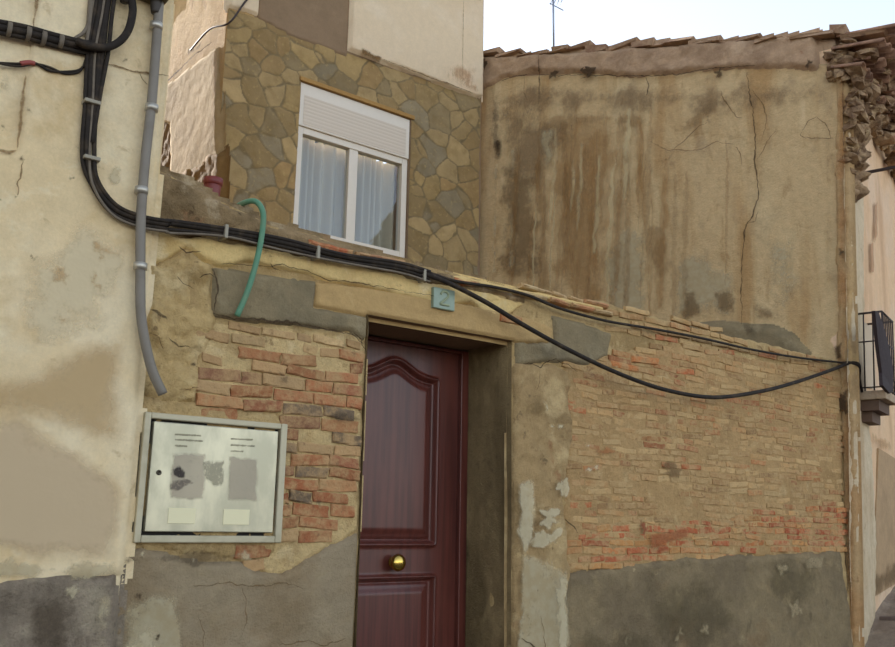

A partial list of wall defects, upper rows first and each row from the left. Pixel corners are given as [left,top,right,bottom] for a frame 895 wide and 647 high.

leakage [495,116,564,273]
crack [502,60,775,324]
leakage [678,257,732,316]
flaking render [233,534,271,571]
flaking render [185,321,365,543]
flaking render [518,306,850,647]